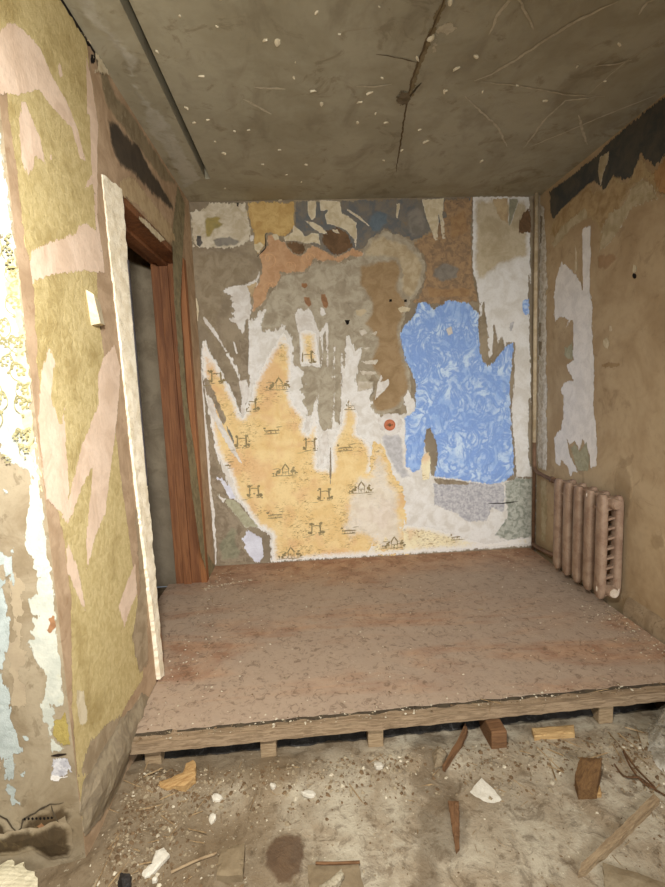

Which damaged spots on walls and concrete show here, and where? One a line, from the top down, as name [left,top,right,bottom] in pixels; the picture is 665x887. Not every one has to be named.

crack [377,0,446,171]
peeling [64,0,253,577]
peeling [285,197,473,256]
peeling [537,98,665,541]
peeling [76,690,87,726]